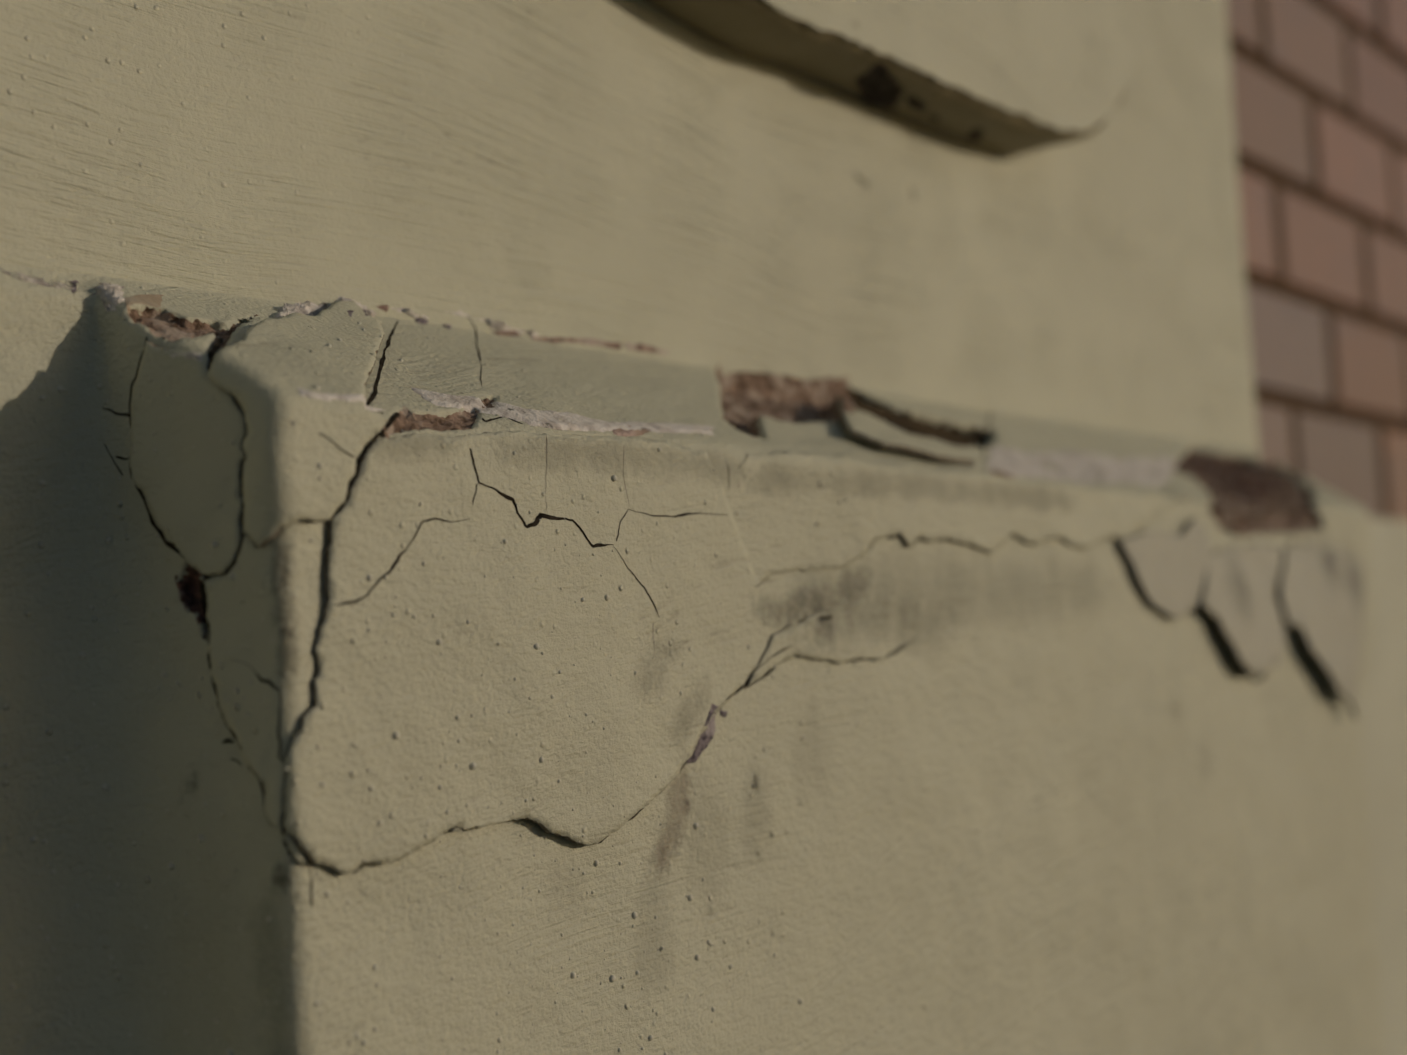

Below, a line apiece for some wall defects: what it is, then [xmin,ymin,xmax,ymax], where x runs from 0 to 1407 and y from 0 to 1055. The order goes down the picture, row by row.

spalling [854,62,939,124]
crack [102,337,315,907]
crack [318,321,401,514]
crack [334,319,730,649]
flaking render [1,269,1366,875]
crack [713,645,812,719]
crack [846,639,916,662]
crack [594,762,687,845]